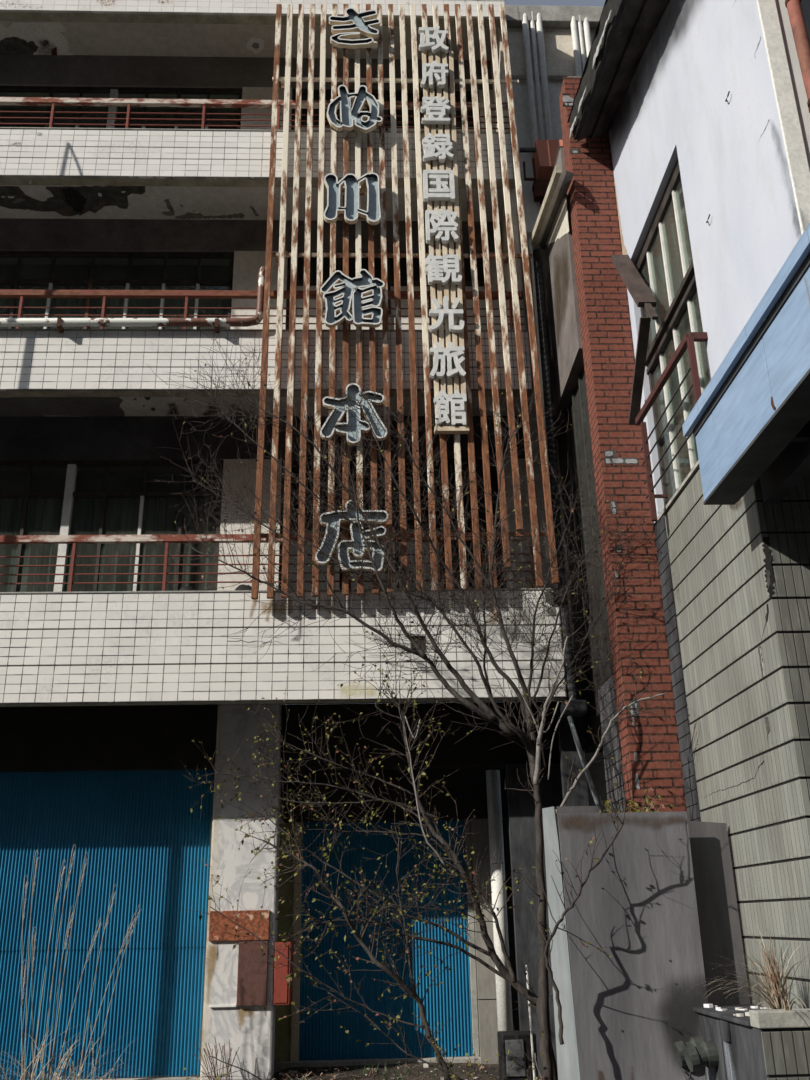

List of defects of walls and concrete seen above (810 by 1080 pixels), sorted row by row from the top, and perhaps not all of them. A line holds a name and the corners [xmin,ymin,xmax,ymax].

peeling [0,22,74,55]
spalling [0,186,145,216]
corrosion [204,946,218,983]